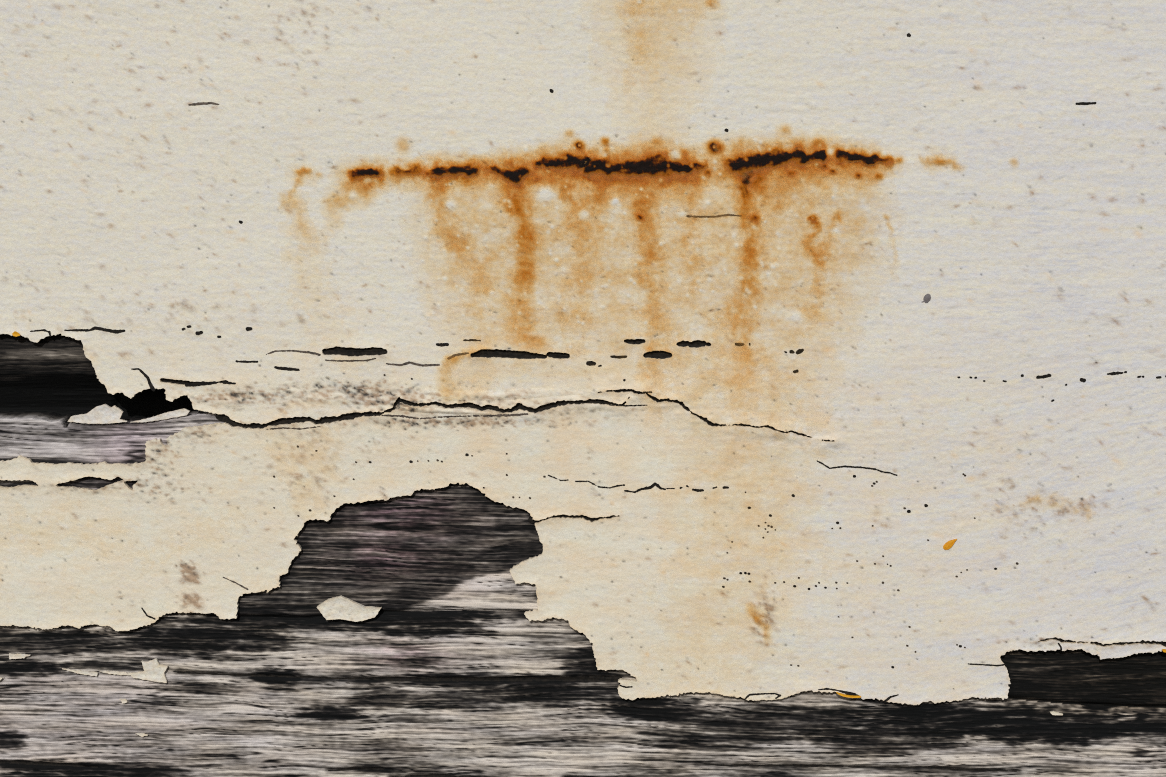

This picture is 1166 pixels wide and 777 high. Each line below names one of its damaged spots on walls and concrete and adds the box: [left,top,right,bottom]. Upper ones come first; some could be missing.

corrosion [349,168,380,179]
corrosion [394,142,892,197]
crack [30,326,125,337]
peeling [0,331,225,490]
crack [132,325,897,476]
peeling [0,483,1166,777]